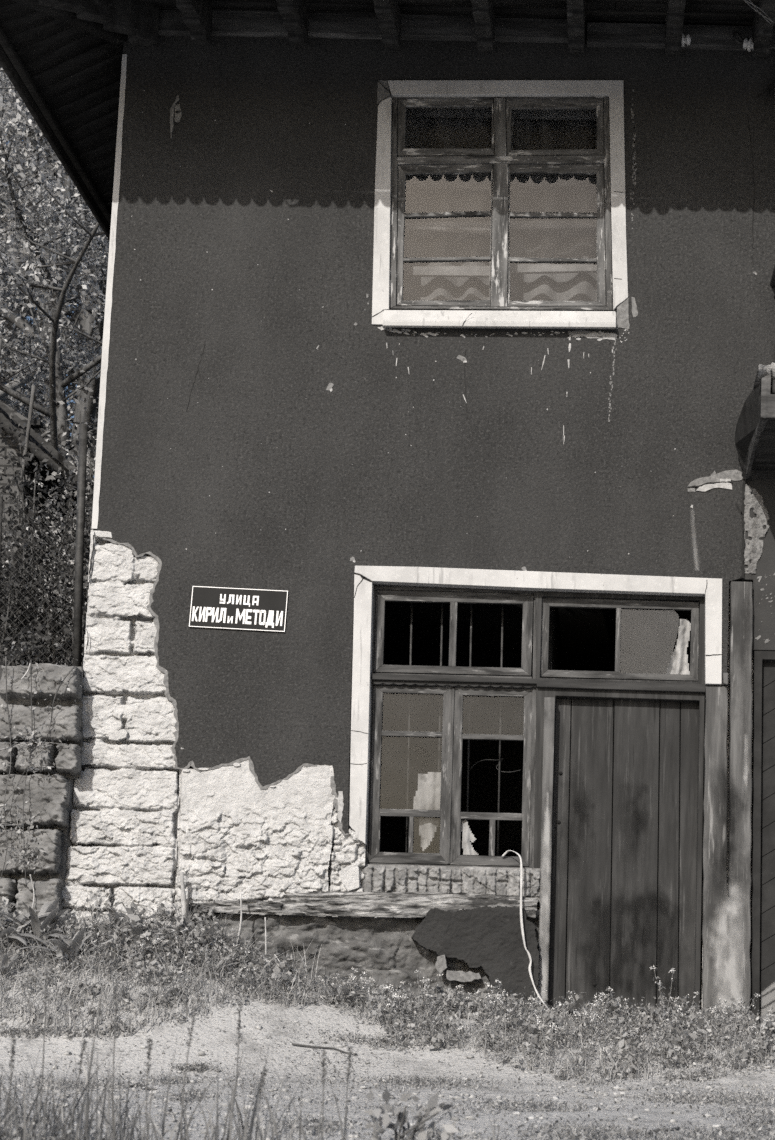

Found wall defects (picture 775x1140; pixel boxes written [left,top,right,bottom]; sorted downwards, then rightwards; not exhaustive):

spalling [62,530,366,934]
spalling [687,470,775,643]